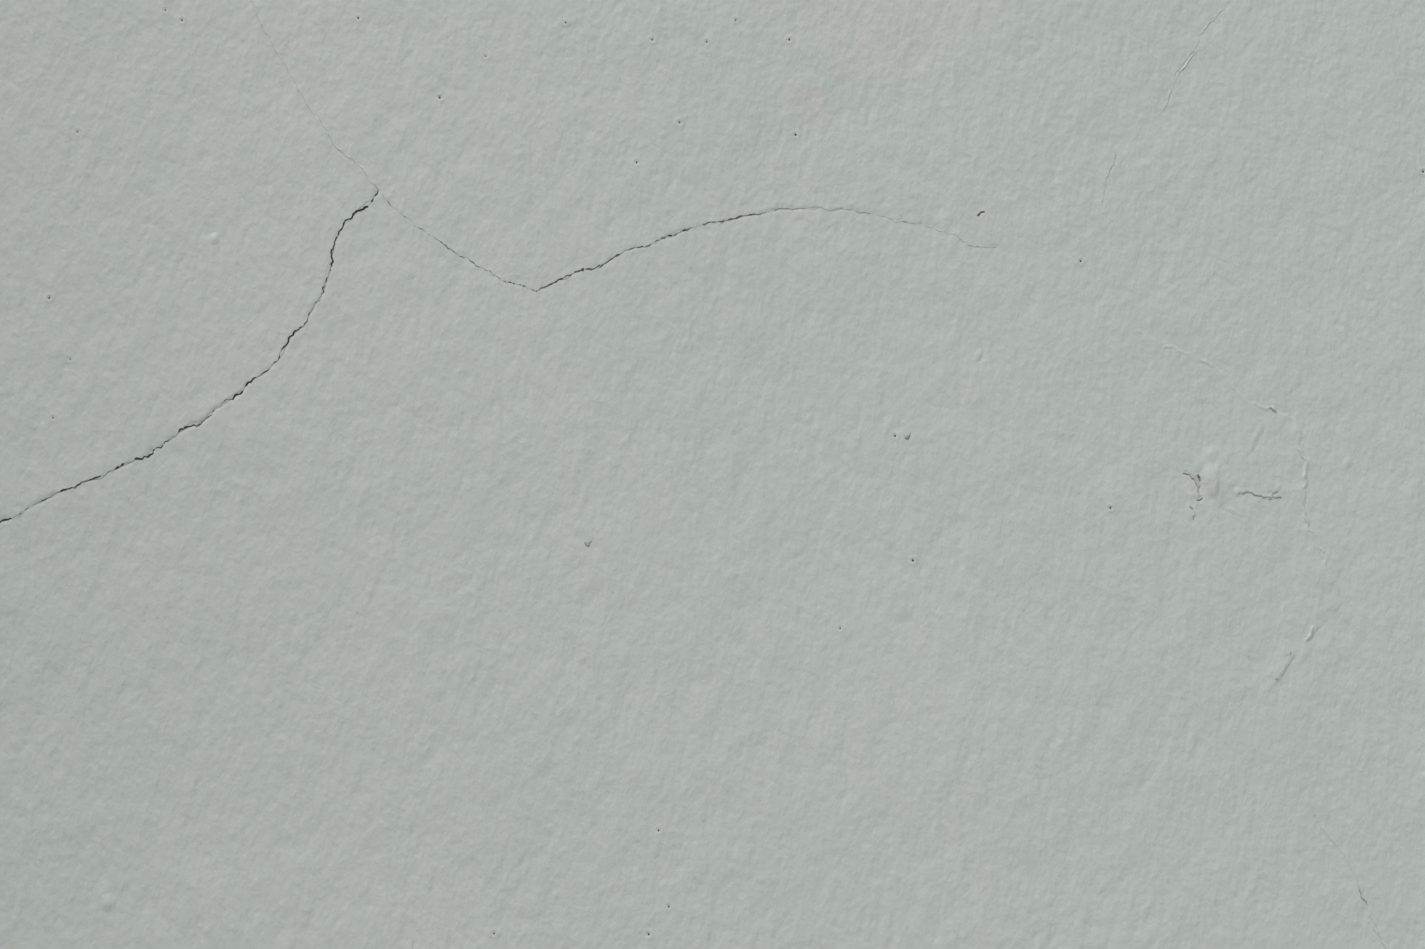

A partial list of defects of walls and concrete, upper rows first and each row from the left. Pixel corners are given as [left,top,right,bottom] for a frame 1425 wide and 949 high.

crack [0,0,994,522]